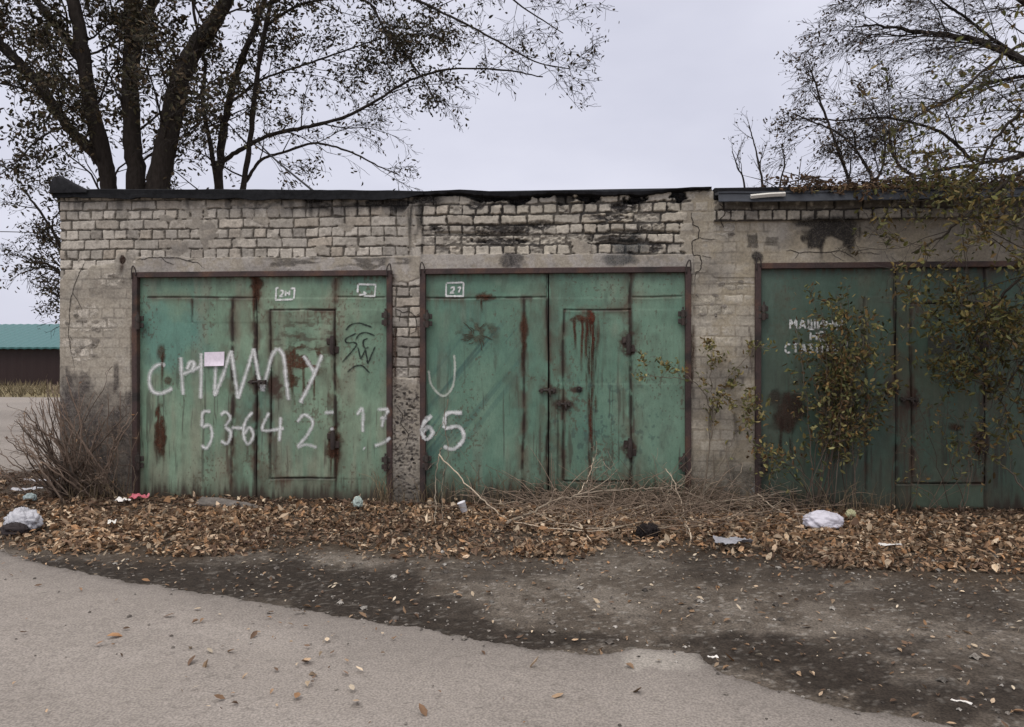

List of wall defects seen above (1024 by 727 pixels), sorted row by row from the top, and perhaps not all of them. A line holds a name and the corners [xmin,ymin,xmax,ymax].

water stain [605,234,646,265]
crack [691,204,733,285]
water stain [796,216,860,253]
rust [520,316,528,357]
rust [571,311,599,475]
rust [155,406,167,455]
rust [771,391,806,451]